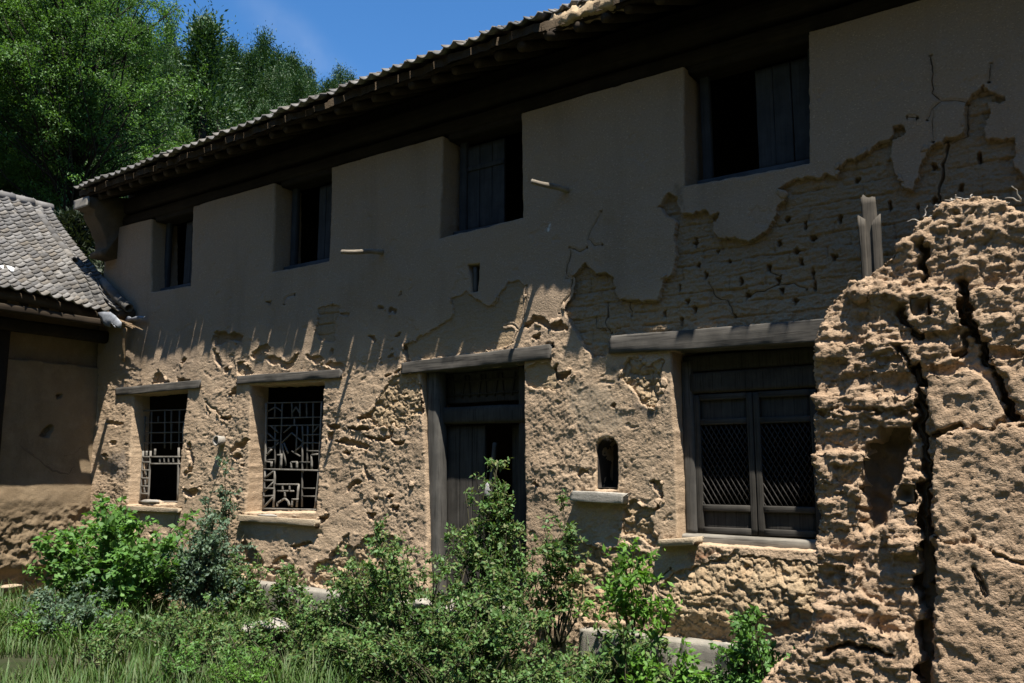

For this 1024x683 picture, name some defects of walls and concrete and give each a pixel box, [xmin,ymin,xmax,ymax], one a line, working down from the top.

crack [926,56,983,202]
crack [558,212,602,313]
spalling [326,88,1024,441]
spalling [216,302,350,375]
crack [897,281,1017,683]
spalling [241,538,312,579]
spalling [300,534,402,595]